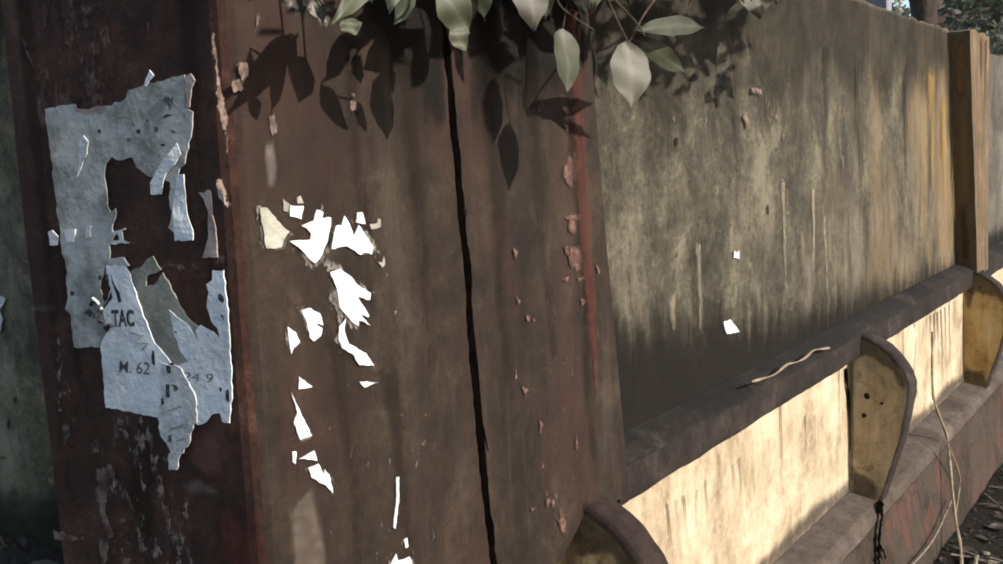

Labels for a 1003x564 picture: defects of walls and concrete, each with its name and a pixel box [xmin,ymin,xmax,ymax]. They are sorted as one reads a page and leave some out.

crack [442,38,497,564]
crack [875,500,886,564]